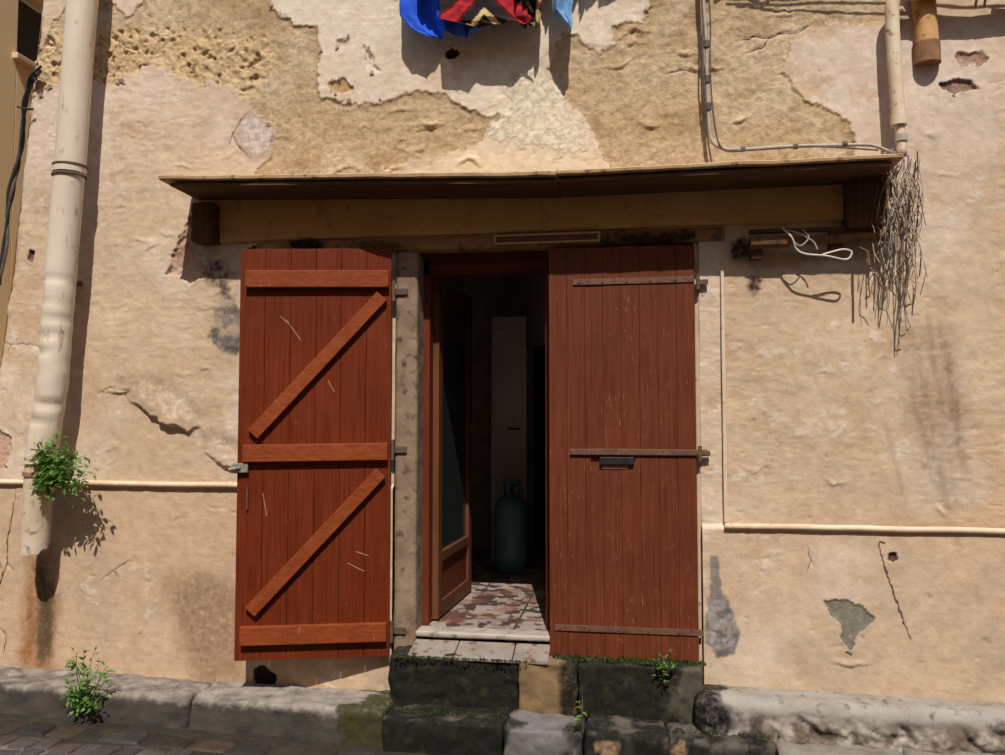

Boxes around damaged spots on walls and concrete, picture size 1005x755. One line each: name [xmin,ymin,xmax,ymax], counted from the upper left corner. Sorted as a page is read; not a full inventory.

flaking render [31,8,66,97]
flaking render [92,0,887,175]
flaking render [939,79,978,95]
flaking render [955,52,988,67]
flaking render [166,217,208,285]
water stain [207,261,240,354]
flaking render [0,430,12,468]
crack [0,490,16,585]
peeling [825,599,875,653]